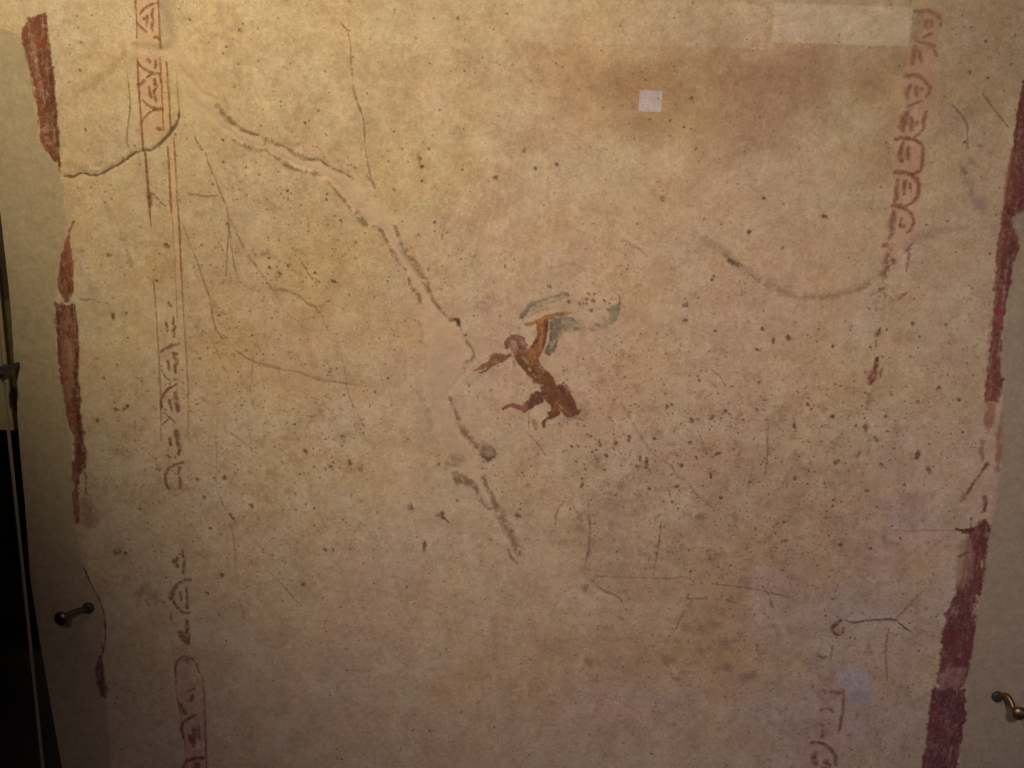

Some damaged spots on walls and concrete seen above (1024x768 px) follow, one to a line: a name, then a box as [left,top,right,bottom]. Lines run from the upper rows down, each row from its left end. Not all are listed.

crack [66,71,520,563]